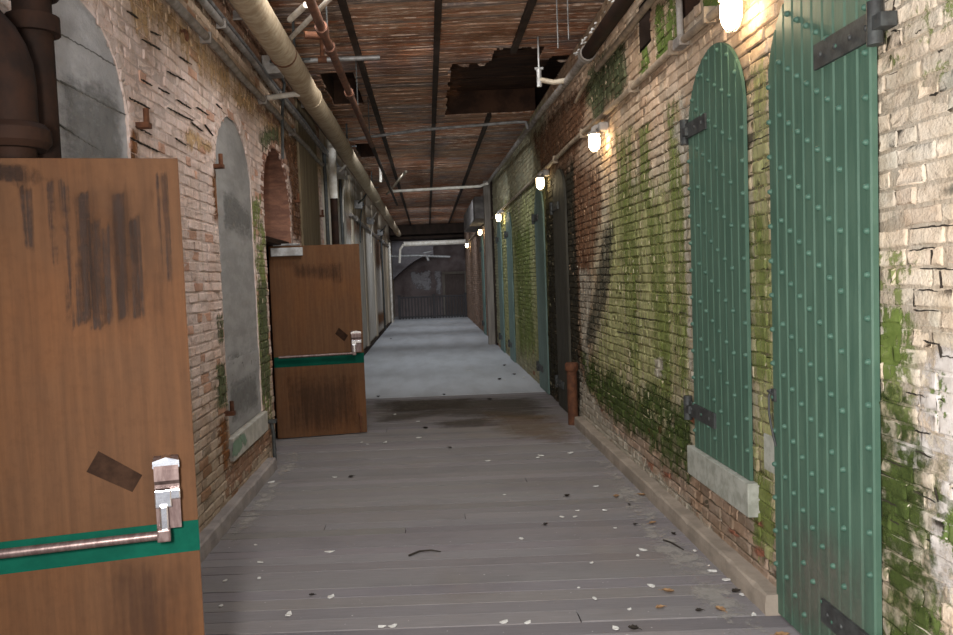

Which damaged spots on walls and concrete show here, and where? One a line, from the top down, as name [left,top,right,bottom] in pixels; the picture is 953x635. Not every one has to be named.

leakage [514,224,535,354]
leakage [544,159,713,531]
leakage [616,104,690,399]
crack [909,224,953,312]
crack [923,340,953,358]
leakage [898,348,953,597]
leakage [613,473,763,631]